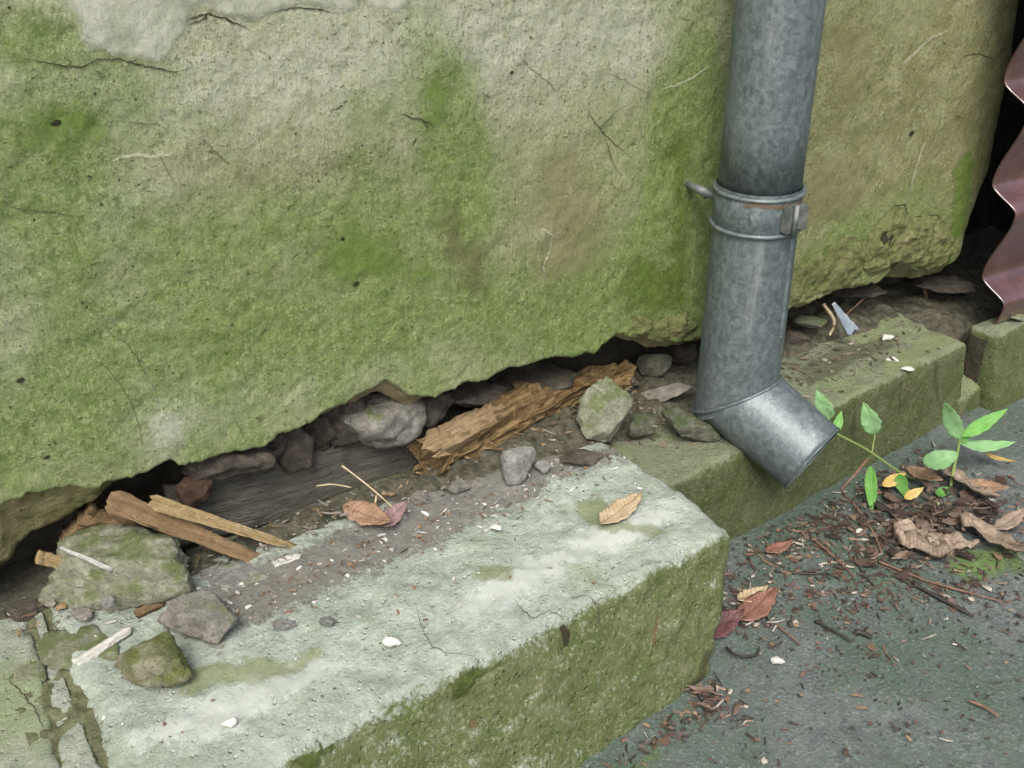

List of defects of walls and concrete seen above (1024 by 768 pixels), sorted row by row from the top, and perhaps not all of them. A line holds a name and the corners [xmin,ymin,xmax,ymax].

crack [273,6,335,14]
crack [185,12,249,30]
crack [24,58,191,72]
rust [742,199,803,210]
crack [516,595,605,638]
crack [4,678,47,736]